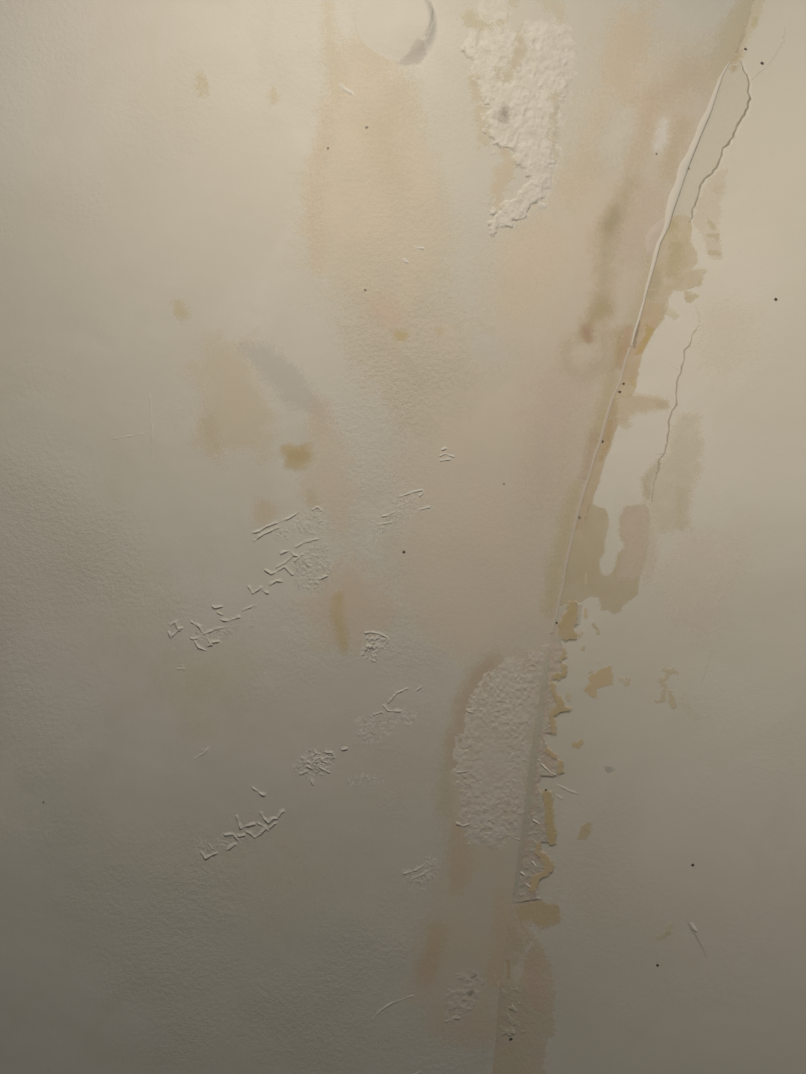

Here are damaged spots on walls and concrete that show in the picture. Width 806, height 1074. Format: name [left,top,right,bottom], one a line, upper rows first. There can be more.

damp [299,3,451,323]
peeling [631,61,730,346]
peeling [164,505,334,671]
damp [195,344,357,530]
damp [395,0,763,1074]
crack [652,314,700,496]
peeling [511,600,582,904]